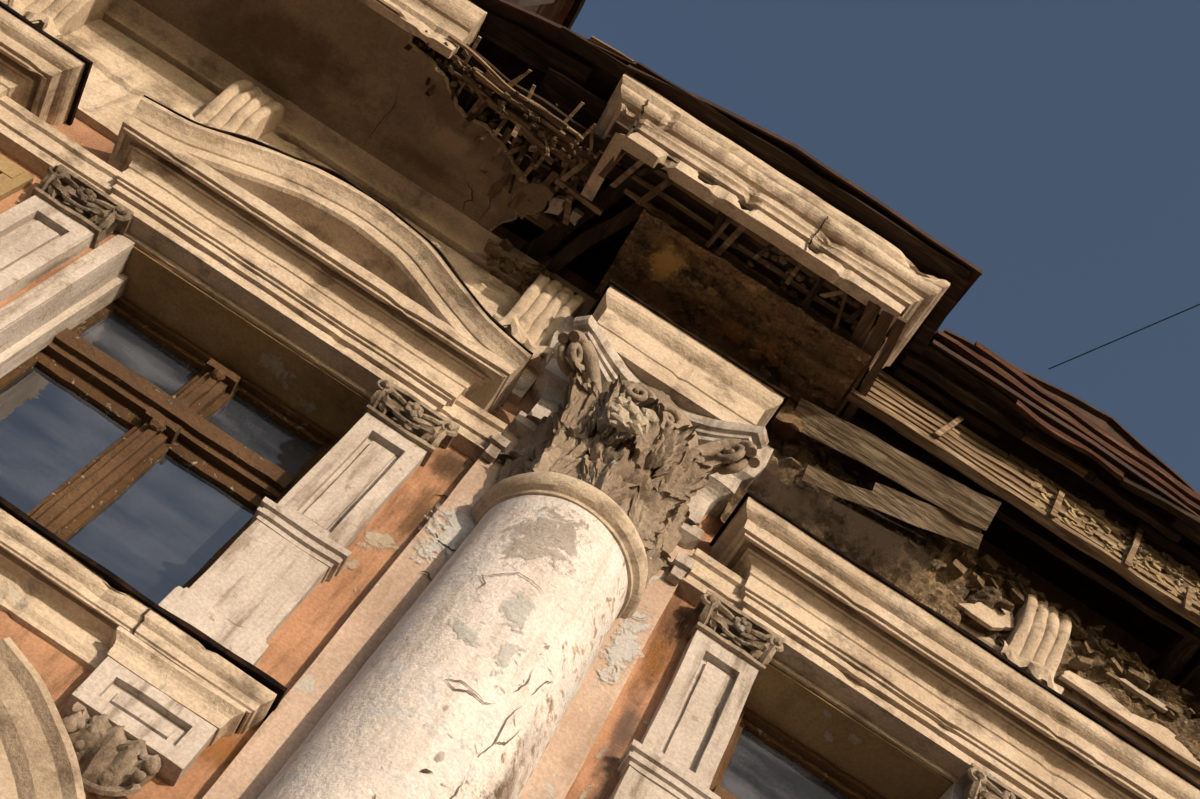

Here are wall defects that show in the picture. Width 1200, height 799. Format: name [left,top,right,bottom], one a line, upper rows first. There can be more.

spalling [398,12,1200,772]
crack [476,572,544,593]
crack [445,668,551,799]